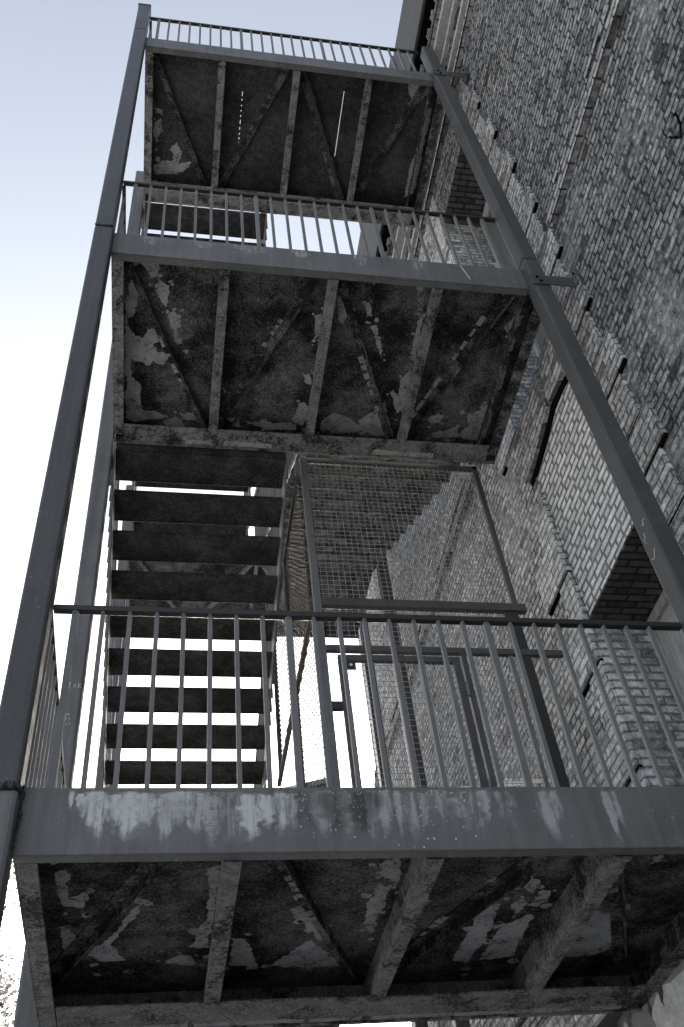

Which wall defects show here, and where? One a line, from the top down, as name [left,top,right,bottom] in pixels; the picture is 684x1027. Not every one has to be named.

peeling [152,108,191,181]
peeling [124,262,525,449]
peeling [372,449,434,458]
peeling [50,863,94,951]
peeling [88,898,153,976]
peeling [156,865,221,966]
peeling [225,875,339,972]
peeling [358,858,402,941]
peeling [453,874,557,977]
peeling [565,911,612,957]
peeling [646,970,684,1027]